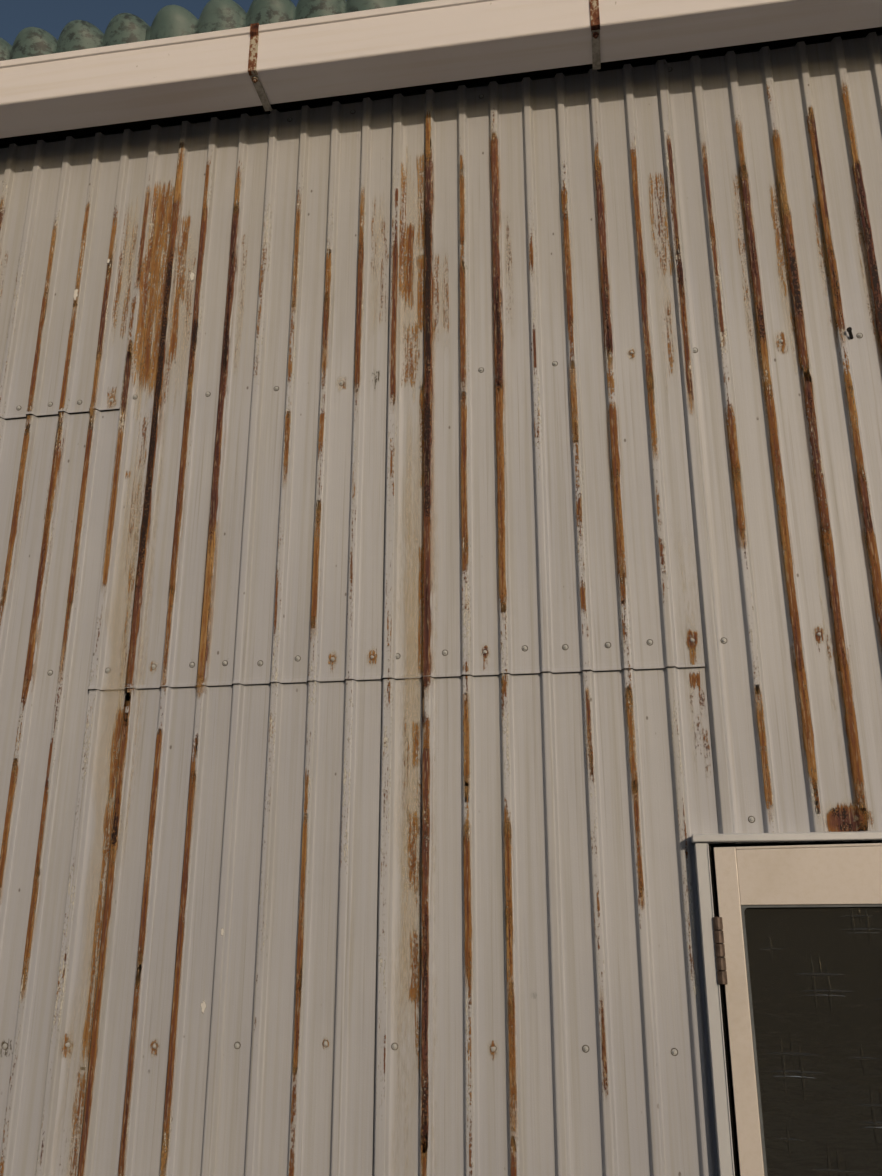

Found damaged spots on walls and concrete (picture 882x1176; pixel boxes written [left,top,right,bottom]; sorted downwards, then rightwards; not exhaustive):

rust [19,127,212,1176]
rust [197,160,247,694]
rust [289,770,311,1176]
rust [308,201,350,704]
rust [340,98,473,1176]
rust [482,89,512,770]
rust [504,799,518,1176]
rust [560,162,585,567]
rust [582,670,595,796]
rust [593,138,648,928]
rust [630,115,693,453]
rust [699,135,748,569]